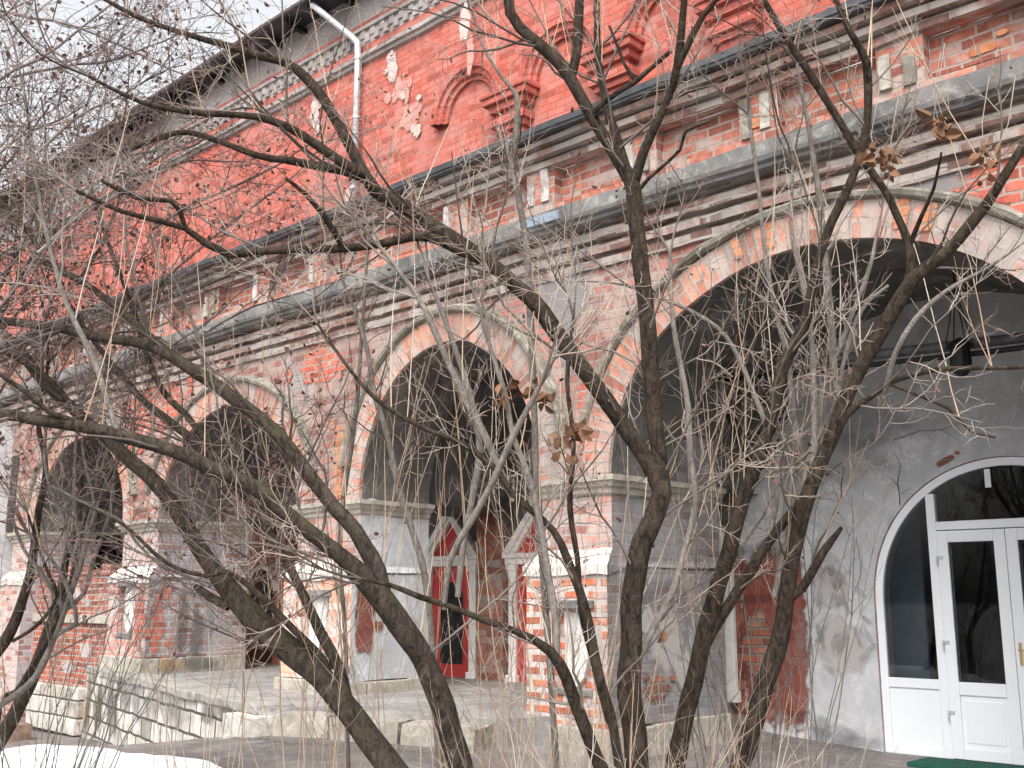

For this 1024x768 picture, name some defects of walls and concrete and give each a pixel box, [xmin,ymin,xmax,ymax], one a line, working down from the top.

peeling [383,50,422,138]
flaking render [737,547,781,717]
flaking render [765,560,809,732]